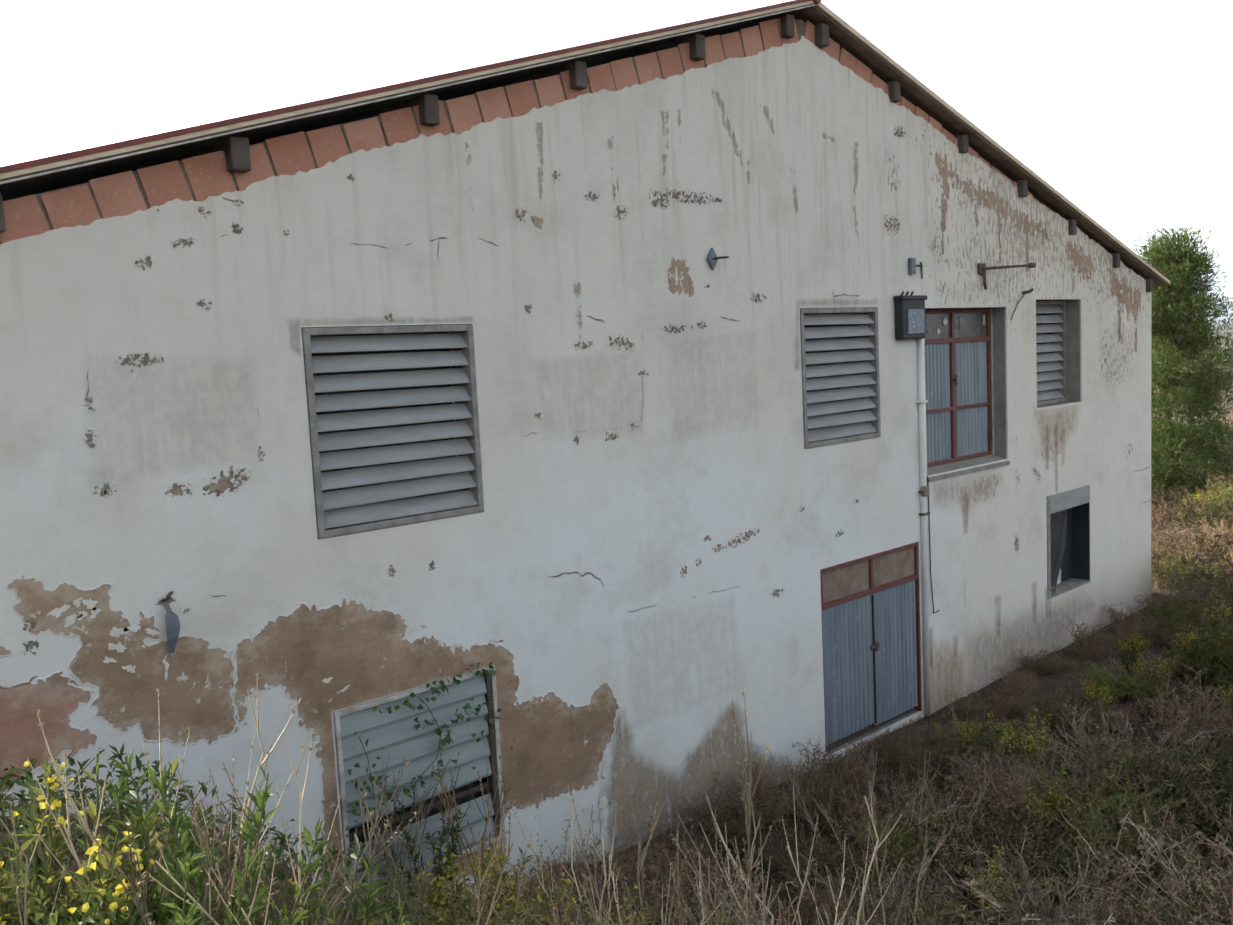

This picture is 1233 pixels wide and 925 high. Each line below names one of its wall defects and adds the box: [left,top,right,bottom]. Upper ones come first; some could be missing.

flaking render [649,188,722,209]
water stain [930,152,1048,272]
crack [353,237,446,259]
water stain [1063,241,1143,352]
flaking render [116,353,163,373]
flaking render [165,466,250,502]
flaking render [680,528,759,578]
crack [547,572,604,585]
flaking render [0,575,621,892]
water stain [609,709,791,854]